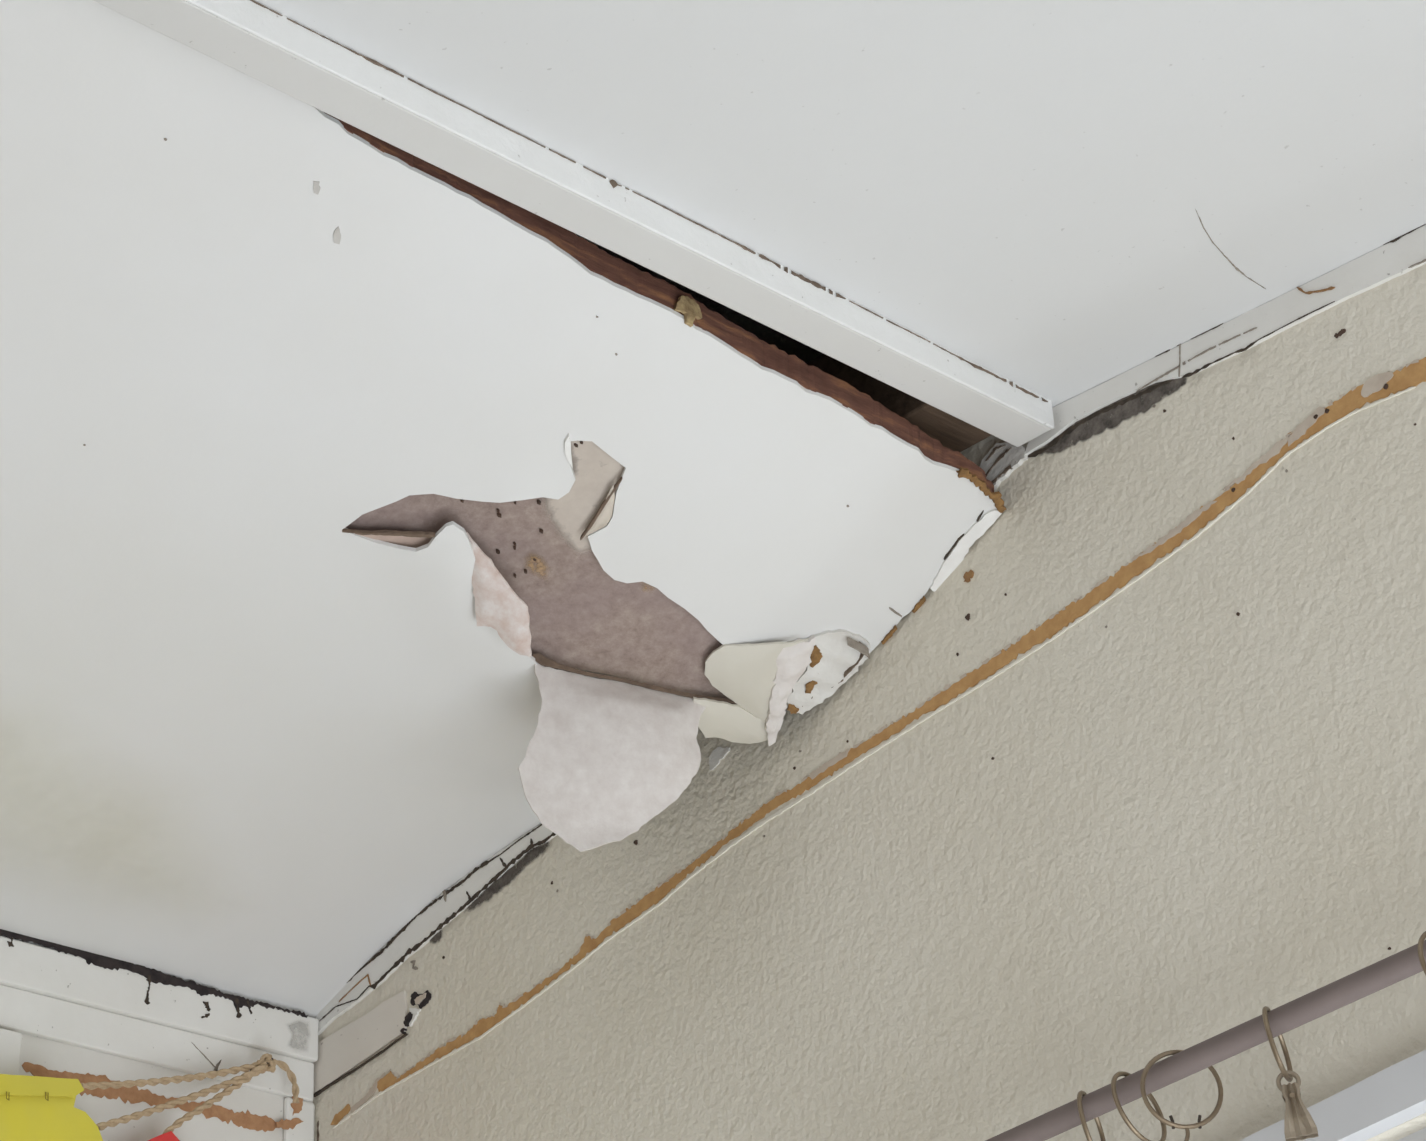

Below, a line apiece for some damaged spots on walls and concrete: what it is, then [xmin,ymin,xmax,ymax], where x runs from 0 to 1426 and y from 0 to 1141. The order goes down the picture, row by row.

crack [250,0,1048,402]
crack [985,445,1016,484]
crack [320,824,556,1021]
peeling [330,357,1426,1129]